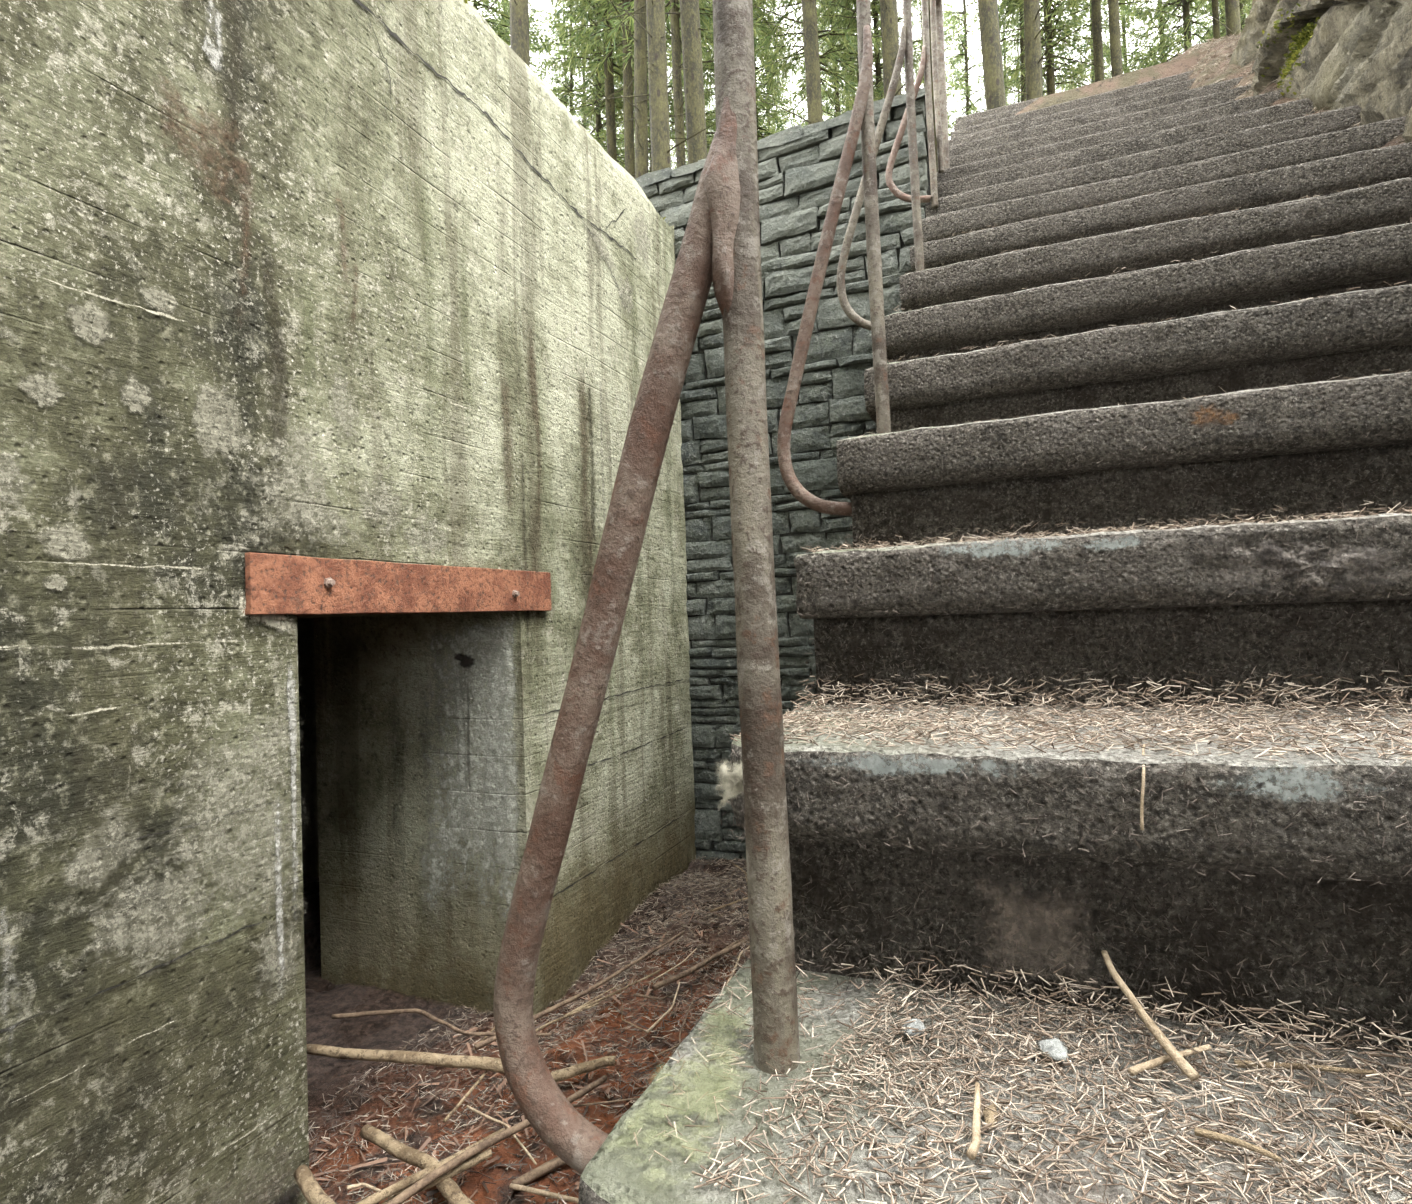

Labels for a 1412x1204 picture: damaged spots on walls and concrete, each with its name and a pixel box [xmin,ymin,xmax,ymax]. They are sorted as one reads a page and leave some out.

damp [202,0,242,165]
crack [355,0,637,311]
damp [263,257,288,464]
damp [503,345,541,564]
damp [580,379,605,574]